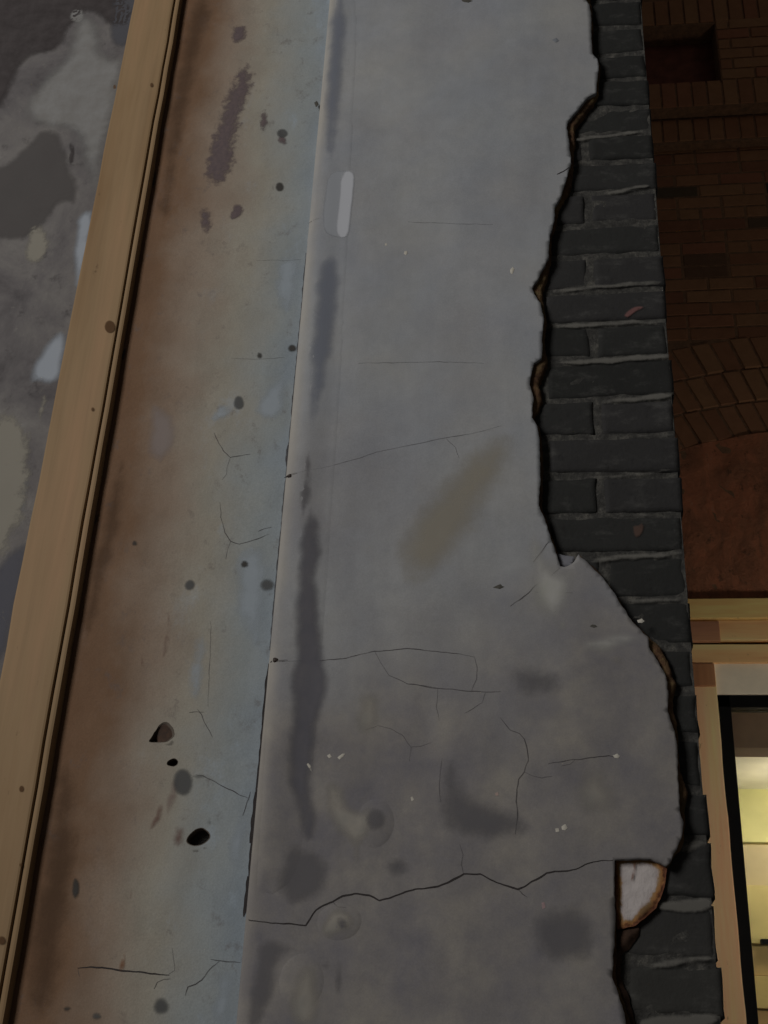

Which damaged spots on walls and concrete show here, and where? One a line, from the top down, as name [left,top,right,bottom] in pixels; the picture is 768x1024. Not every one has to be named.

leakage [315,263,335,388]
crack [199,254,614,926]
peeling [558,554,575,567]
leakage [291,522,324,834]
spalling [614,860,667,1024]